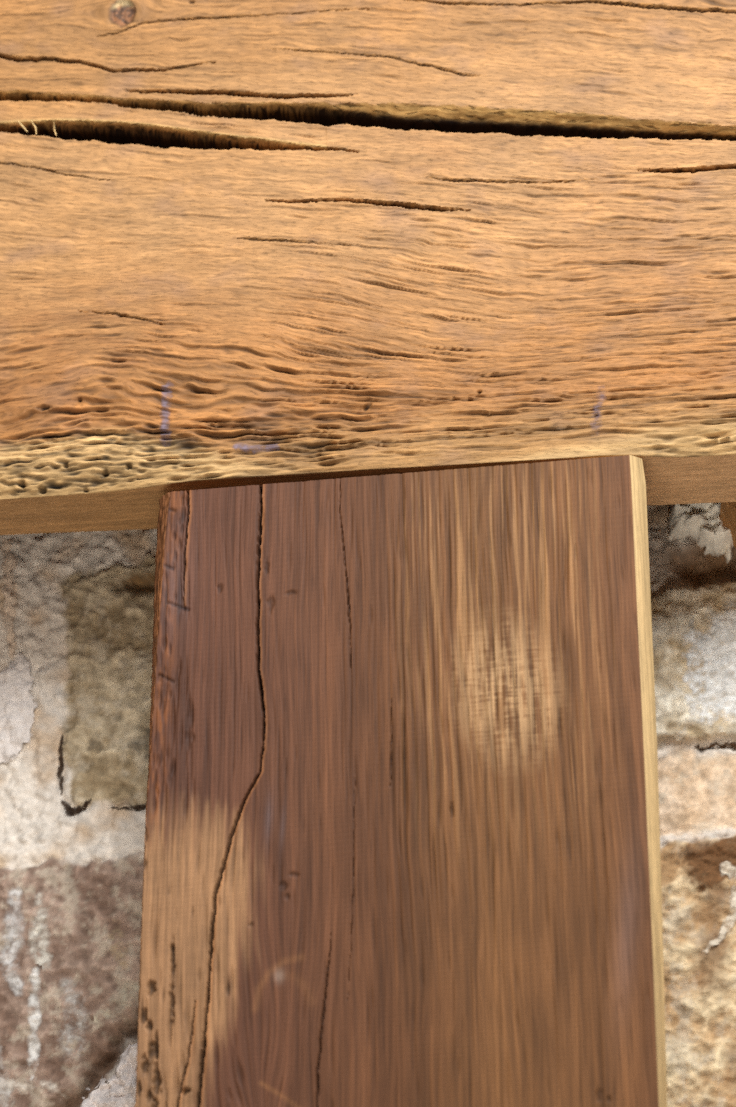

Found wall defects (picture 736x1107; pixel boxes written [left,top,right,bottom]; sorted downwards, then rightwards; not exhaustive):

crack [0,161,117,182]
crack [0,7,736,173]
crack [406,0,736,14]
crack [177,490,266,1106]